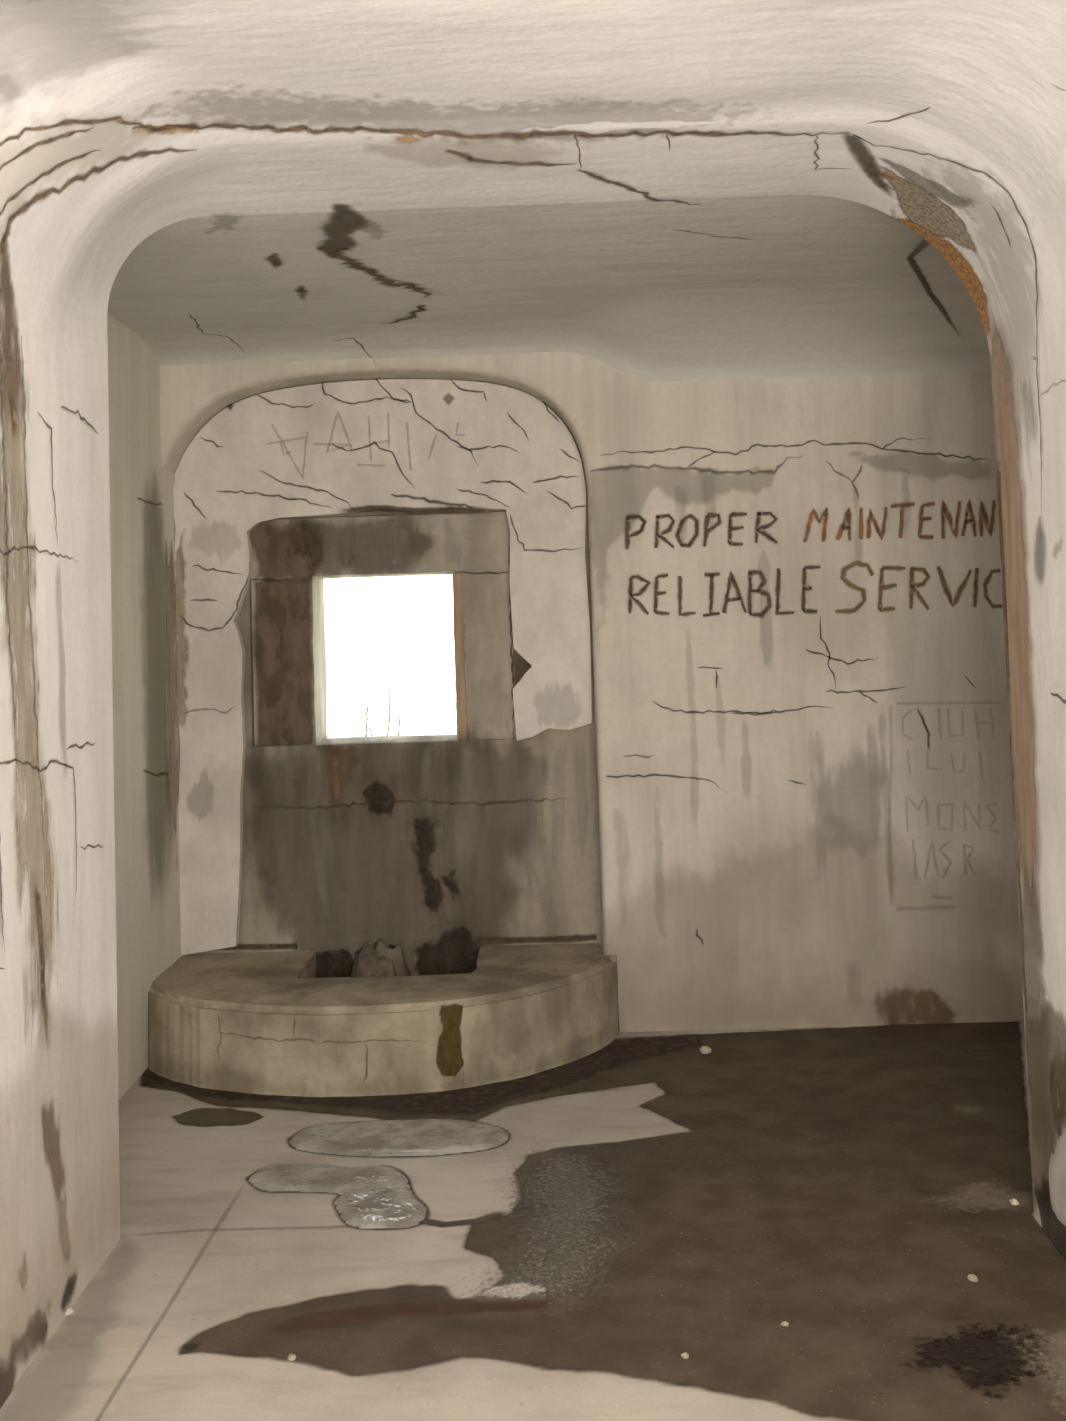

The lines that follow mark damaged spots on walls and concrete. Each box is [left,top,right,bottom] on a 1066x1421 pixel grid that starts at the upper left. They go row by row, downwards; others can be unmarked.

crack [0,107,1042,513]
spalling [846,135,990,335]
crack [0,406,97,559]
crack [137,338,987,751]
leakage [452,574,468,740]
crack [0,742,103,897]
crack [222,943,297,951]
leakage [415,926,481,975]
corrosion [436,1004,464,1076]
leakage [42,1107,70,1259]
leakage [141,990,1066,1421]
leakage [0,1312,47,1409]